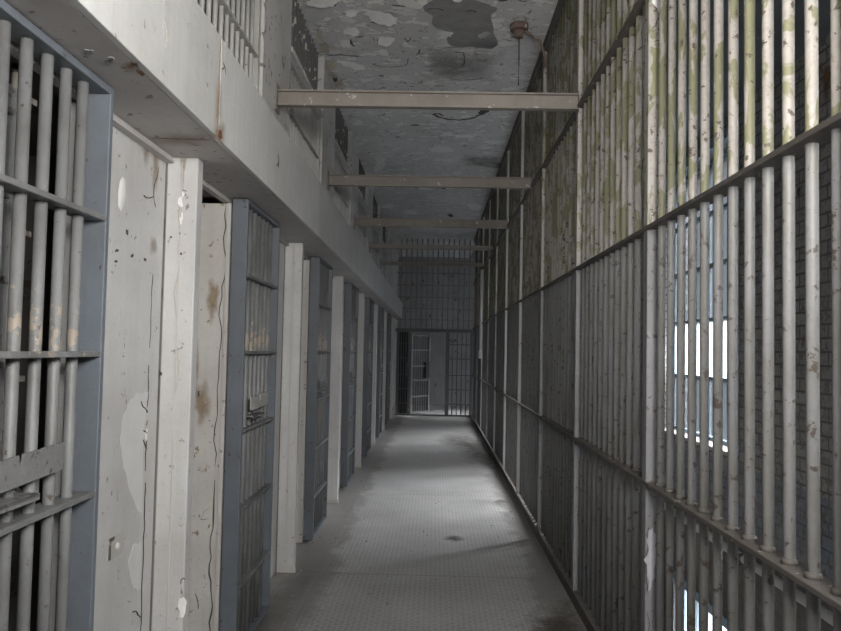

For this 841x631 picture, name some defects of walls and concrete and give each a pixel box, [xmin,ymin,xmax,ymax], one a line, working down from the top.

peeling [306,0,342,8]
peeling [316,0,507,88]
rust [152,38,223,140]
peeling [120,392,148,512]
peeling [128,540,143,592]